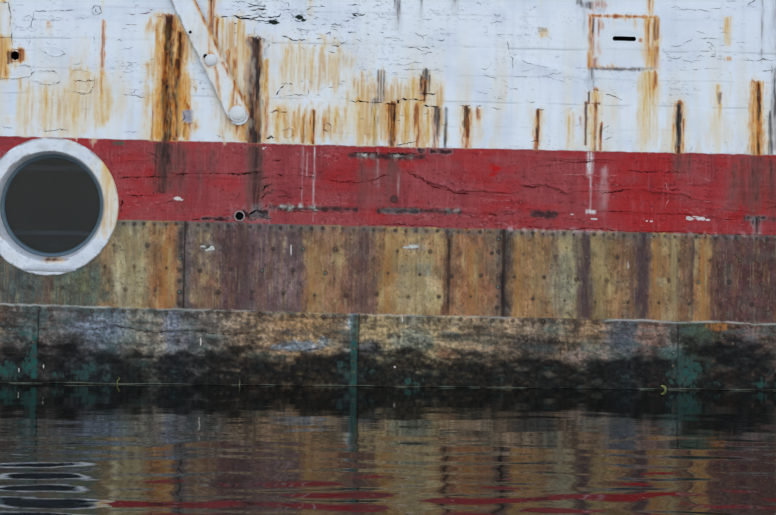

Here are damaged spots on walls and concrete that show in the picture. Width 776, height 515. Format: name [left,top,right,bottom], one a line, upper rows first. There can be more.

peeling [0,45,98,95]
corrosion [0,0,489,316]
crack [218,1,444,75]
crack [352,93,447,145]
crack [462,21,563,110]
corrosion [525,103,550,151]
corrosion [562,84,610,153]
crack [601,170,739,220]
corrosion [585,0,767,155]
water stain [0,223,776,390]
corrosion [505,235,550,319]
corrosion [692,236,714,320]